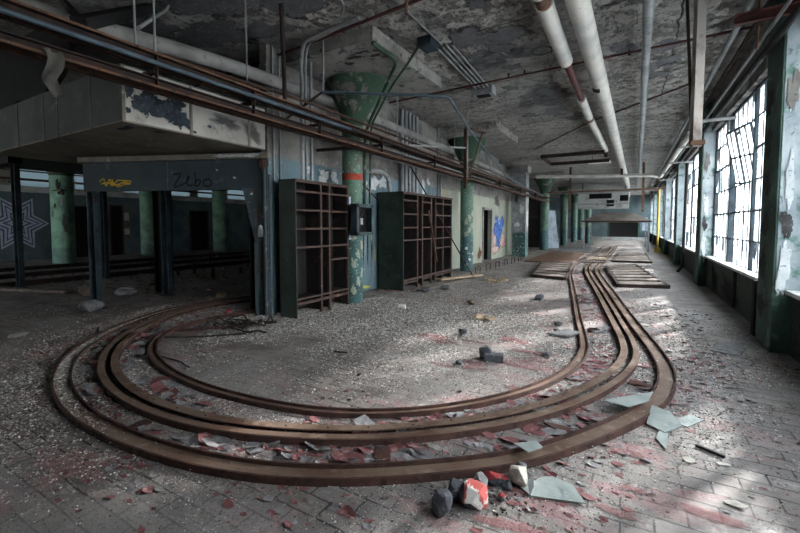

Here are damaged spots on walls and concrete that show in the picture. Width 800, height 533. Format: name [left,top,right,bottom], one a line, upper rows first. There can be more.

peeling [125,86,197,134]
peeling [787,64,800,111]
peeling [308,166,338,184]
peeling [366,176,386,191]
peeling [775,148,795,296]
peeling [350,235,376,295]